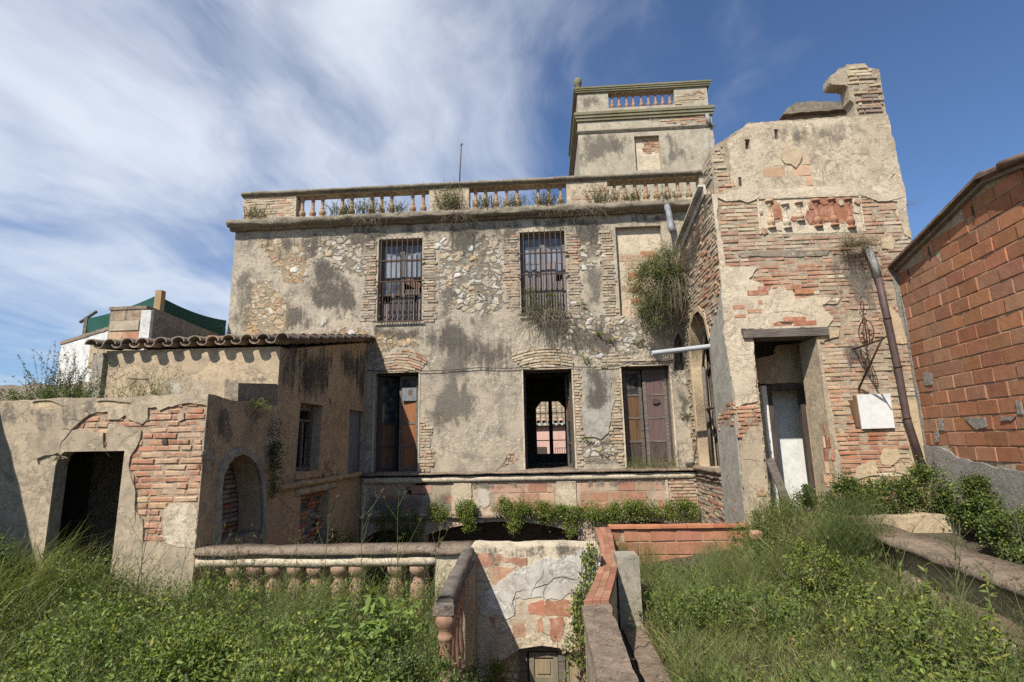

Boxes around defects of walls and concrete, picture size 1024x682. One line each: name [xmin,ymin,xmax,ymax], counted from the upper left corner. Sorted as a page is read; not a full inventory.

flaking render [423,238,438,322]
flaking render [502,232,520,311]
peeling [711,116,911,527]
crack [59,409,90,450]
damp [283,346,367,401]
damp [374,317,511,444]
peeling [512,347,670,466]
spalling [73,400,217,548]
flaking render [474,553,528,584]
flaking render [512,599,571,642]
crack [511,549,578,616]